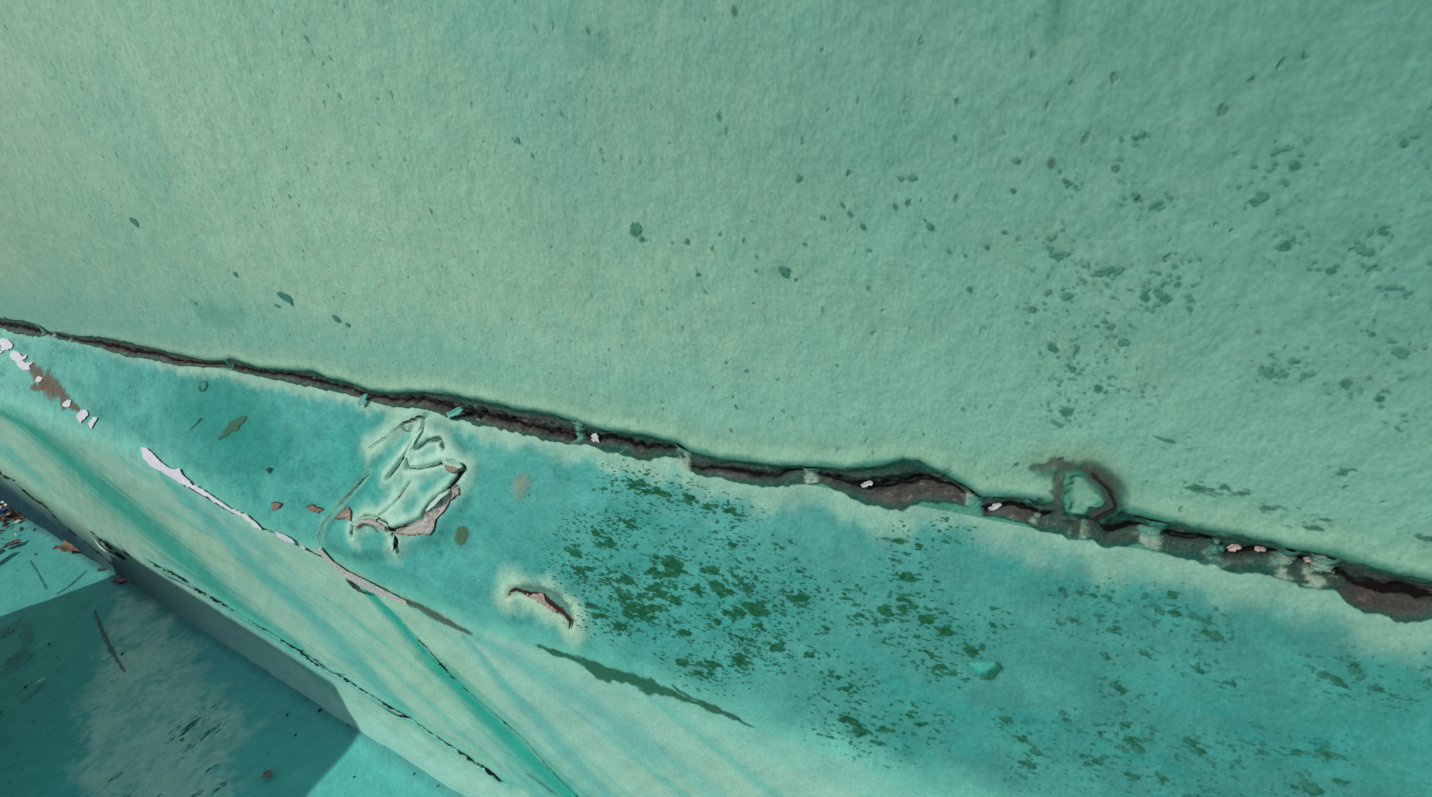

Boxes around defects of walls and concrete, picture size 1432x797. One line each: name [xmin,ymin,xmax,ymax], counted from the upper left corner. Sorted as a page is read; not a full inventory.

peeling [0,338,43,382]
peeling [62,400,97,428]
crack [0,473,578,797]
peeling [141,407,476,635]
damp [671,685,752,727]
crack [0,317,1432,629]